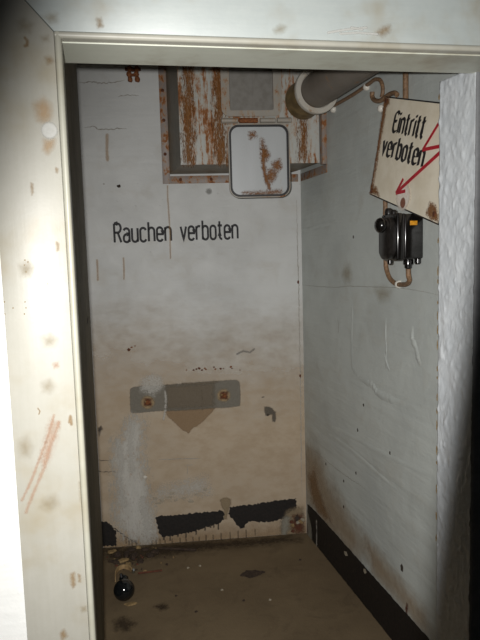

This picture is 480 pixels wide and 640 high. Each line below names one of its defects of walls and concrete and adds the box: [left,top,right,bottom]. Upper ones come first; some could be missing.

damp [93,351,353,548]
peeling [102,521,117,546]
peeling [155,498,312,541]